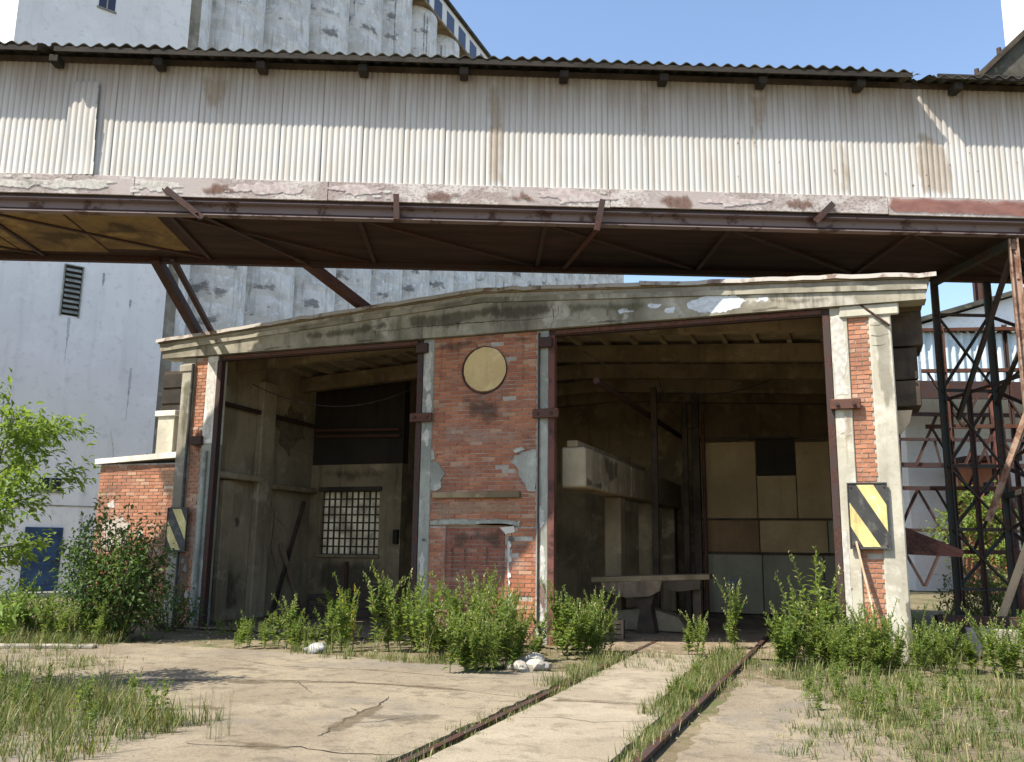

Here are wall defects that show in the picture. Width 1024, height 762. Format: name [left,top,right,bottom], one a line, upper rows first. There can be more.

peeling [0,174,116,189]
peeling [129,180,182,193]
corrosion [204,184,233,193]
peeling [224,182,304,195]
peeling [327,184,391,199]
corrosion [427,191,458,201]
corrosion [662,196,691,208]
peeling [648,295,777,314]